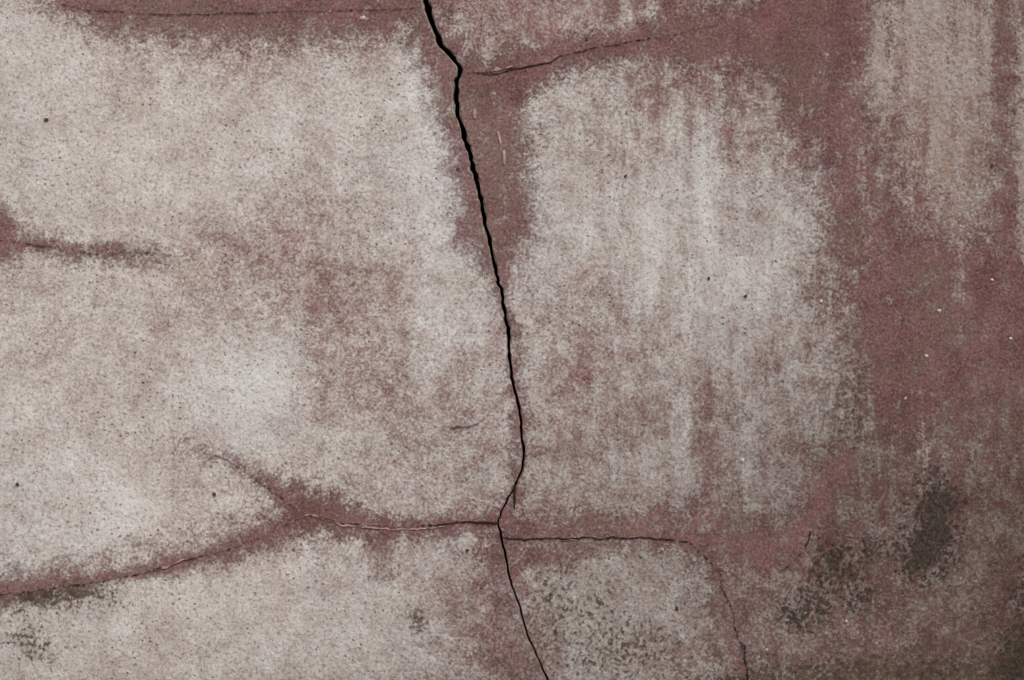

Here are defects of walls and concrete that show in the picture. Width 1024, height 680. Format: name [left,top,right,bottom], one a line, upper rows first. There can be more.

leakage [46,0,1024,462]
crack [0,0,749,680]
leakage [507,345,530,484]
mould [1,619,60,666]
leakage [0,432,968,633]
mould [528,570,682,678]